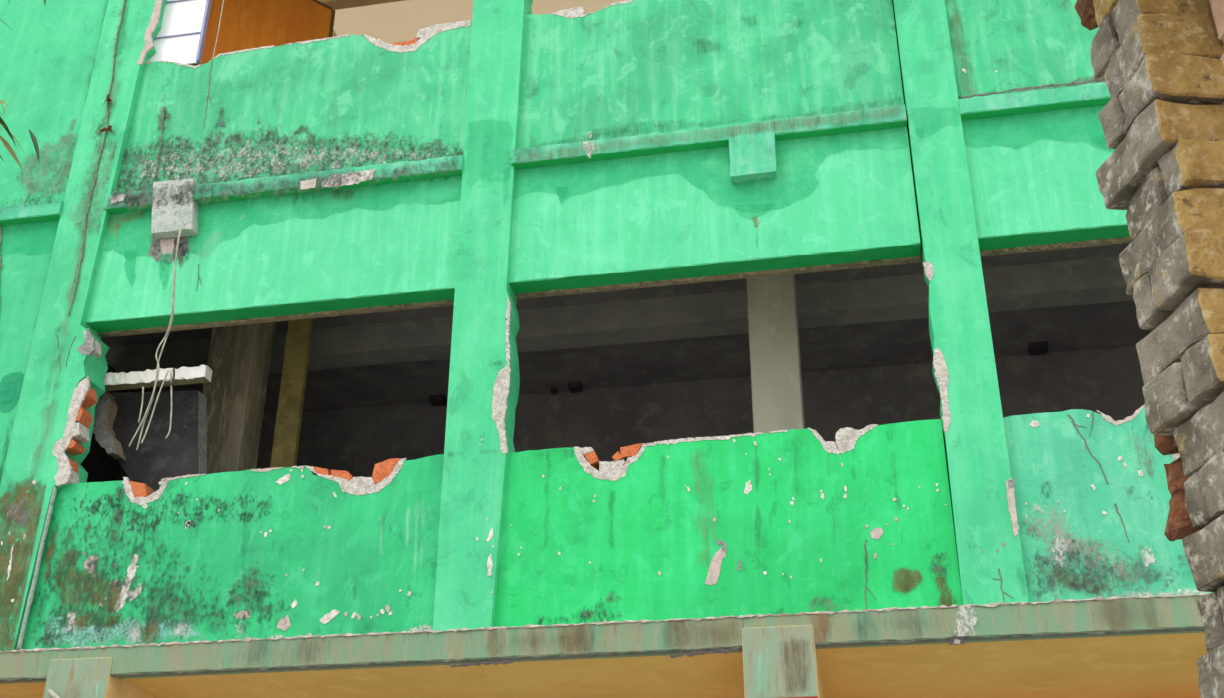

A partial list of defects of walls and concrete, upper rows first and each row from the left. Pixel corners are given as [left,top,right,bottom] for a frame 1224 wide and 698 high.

leakage [72,106,464,228]
spalling [52,376,97,487]
spalling [122,474,205,509]
spalling [251,458,407,498]
spalling [573,430,787,481]
spalling [492,256,934,454]
spalling [808,424,878,466]
spalling [933,347,951,433]
crack [1067,411,1129,542]
peeling [83,551,142,616]
leakage [35,489,284,647]
leakage [957,606,977,636]